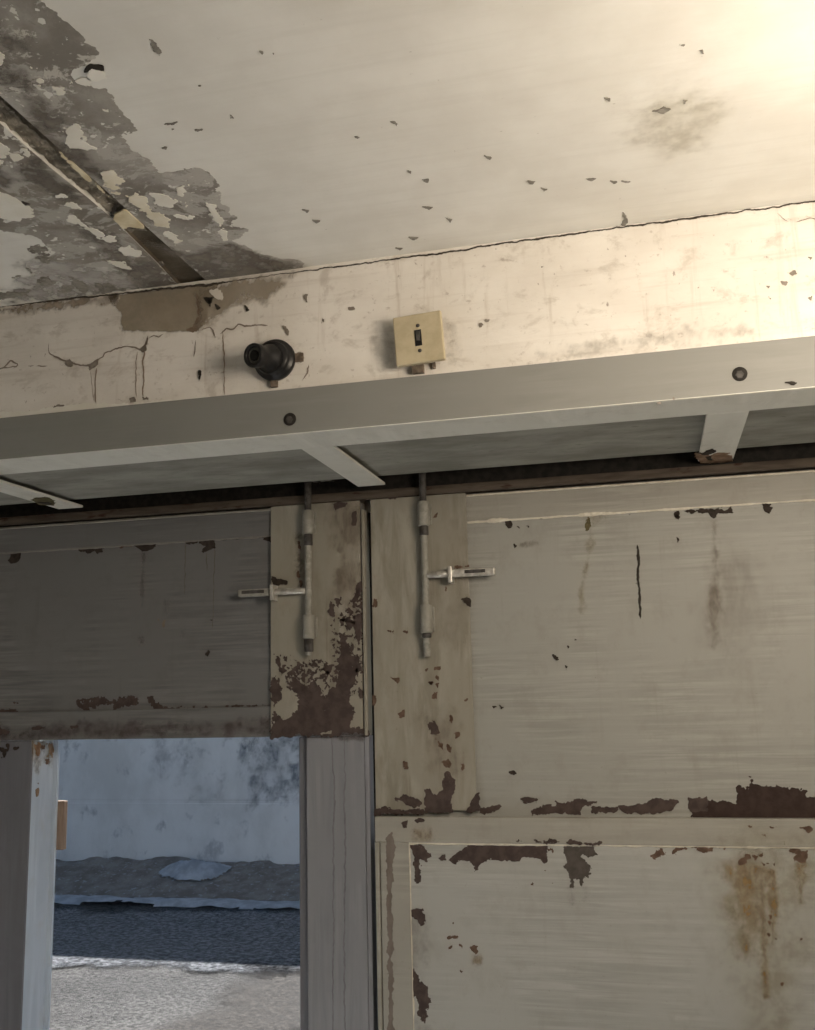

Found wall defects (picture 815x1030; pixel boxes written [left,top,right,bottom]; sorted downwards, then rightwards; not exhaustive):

peeling [0,0,304,288]
crack [0,96,815,307]
leakage [0,244,283,332]
crack [0,334,163,403]
crack [193,324,268,395]
rust [225,581,378,740]
rust [0,695,208,769]
rust [373,715,602,888]
rust [520,776,815,837]
rust [784,843,808,872]
rust [411,908,426,926]
rust [413,969,432,1023]